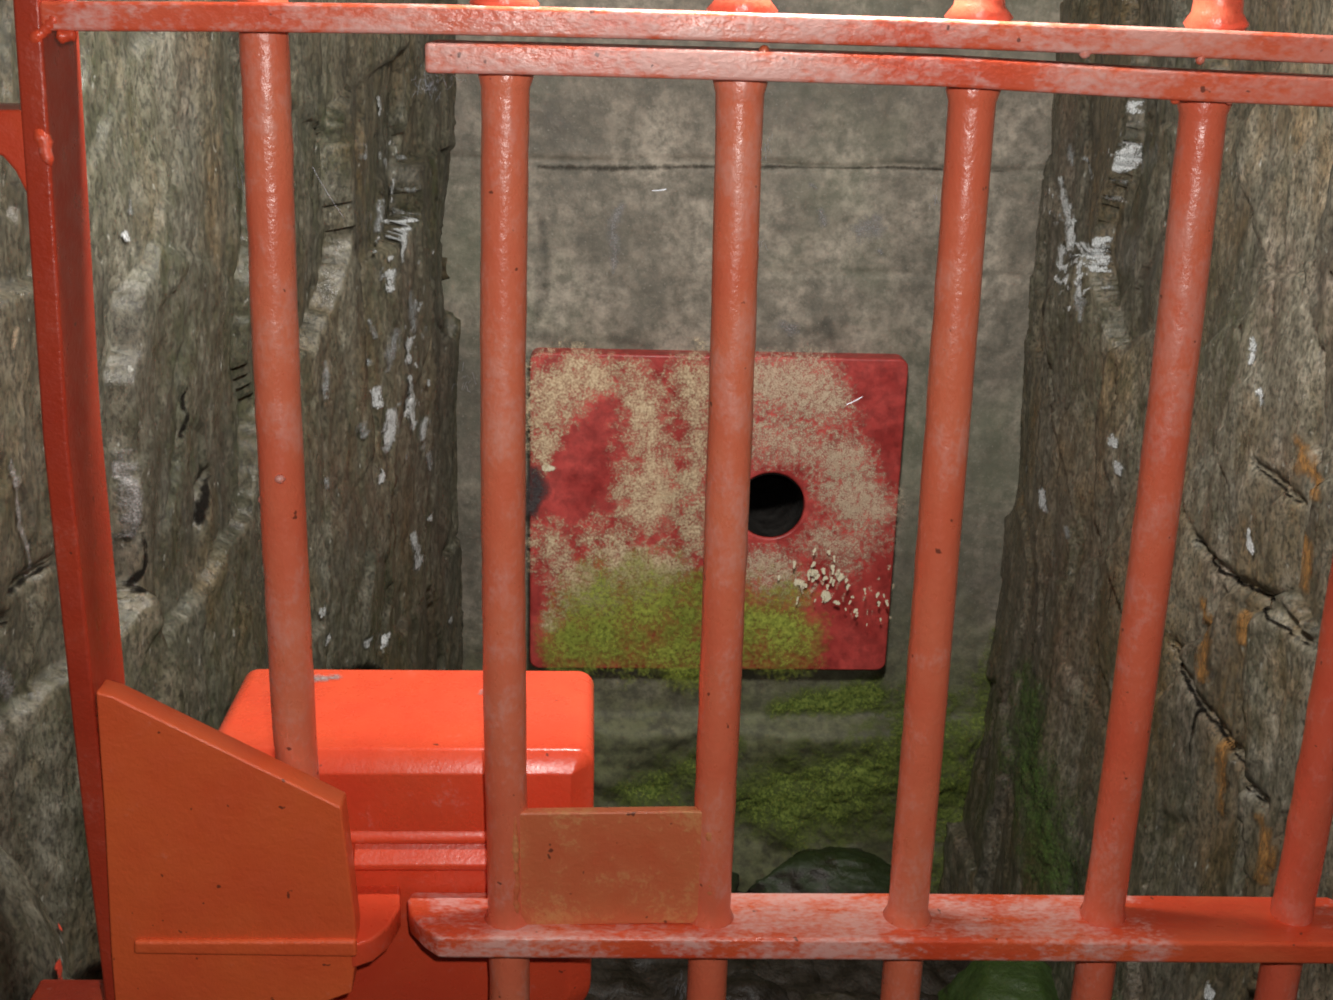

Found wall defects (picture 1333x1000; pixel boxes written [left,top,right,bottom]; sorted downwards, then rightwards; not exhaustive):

peeling [746,353,897,626]